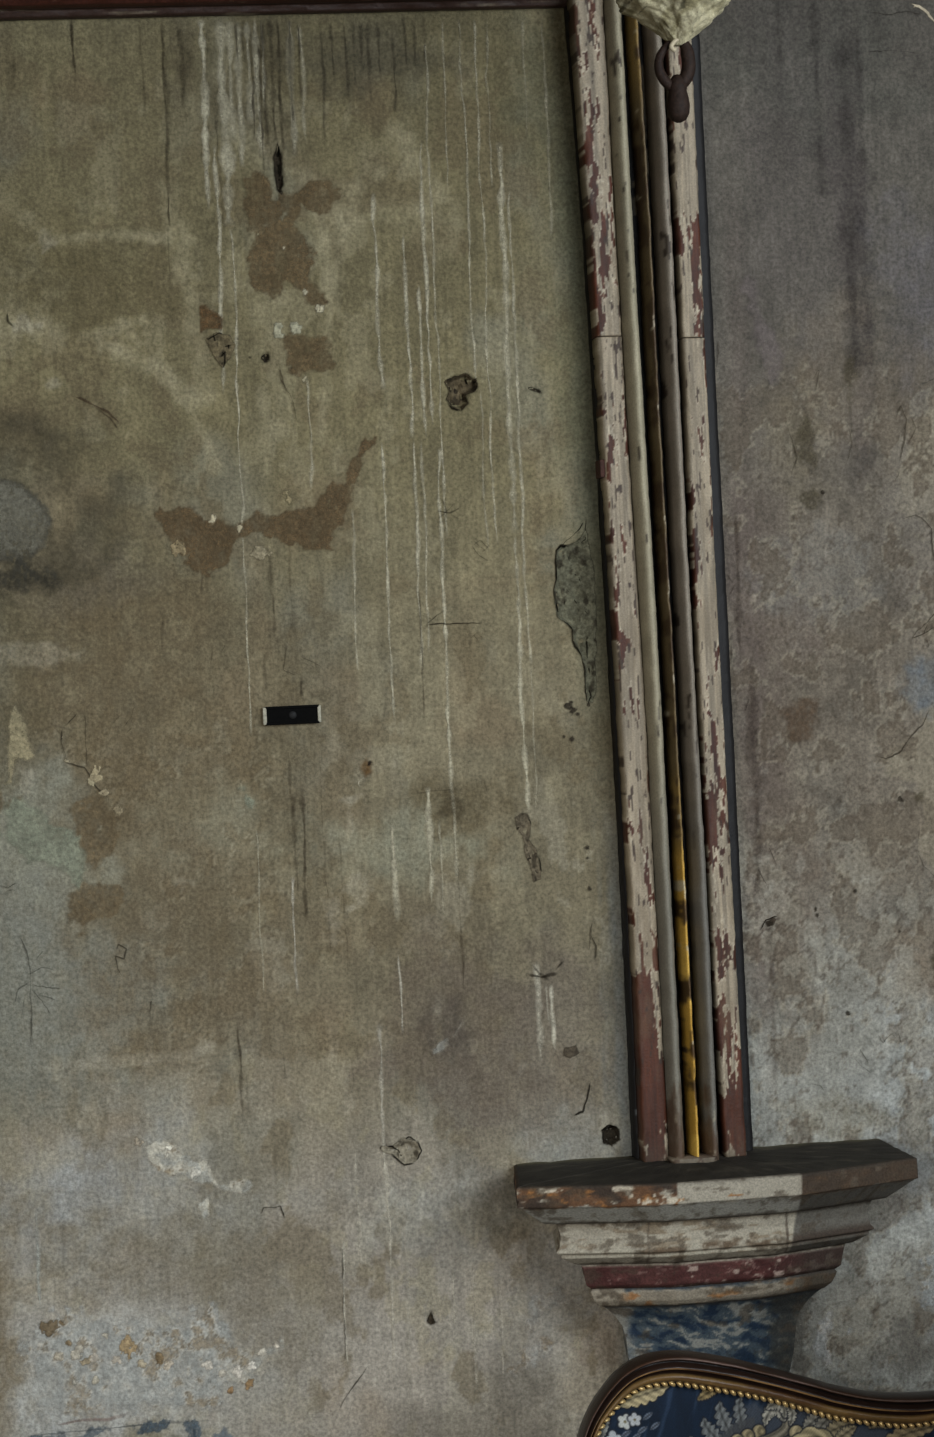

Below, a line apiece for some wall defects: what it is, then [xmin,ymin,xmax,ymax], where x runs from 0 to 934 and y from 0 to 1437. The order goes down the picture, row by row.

water stain [199,22,300,430]
flaking render [243,143,341,312]
water stain [402,172,441,429]
water stain [468,166,515,315]
spalling [444,373,478,411]
water stain [0,479,81,599]
flaking render [154,437,377,577]
water stain [415,442,445,565]
water stain [417,571,452,777]
water stain [518,587,531,729]
water stain [426,791,457,896]
peeling [667,1151,717,1163]